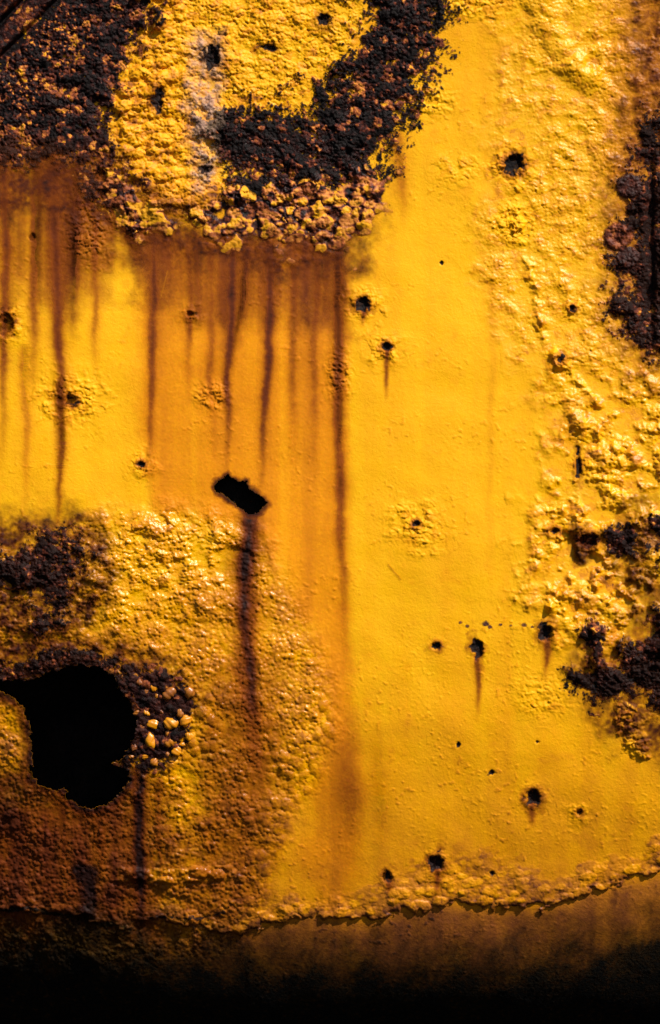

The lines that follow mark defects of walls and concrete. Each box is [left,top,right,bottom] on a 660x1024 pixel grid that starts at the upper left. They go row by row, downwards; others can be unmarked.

corrosion [191,0,469,198]
corrosion [0,0,168,505]
corrosion [598,94,660,368]
corrosion [0,521,126,696]
corrosion [127,229,361,892]
corrosion [556,601,660,719]
corrosion [602,513,660,577]
spalling [374,864,401,892]
spalling [413,840,458,890]